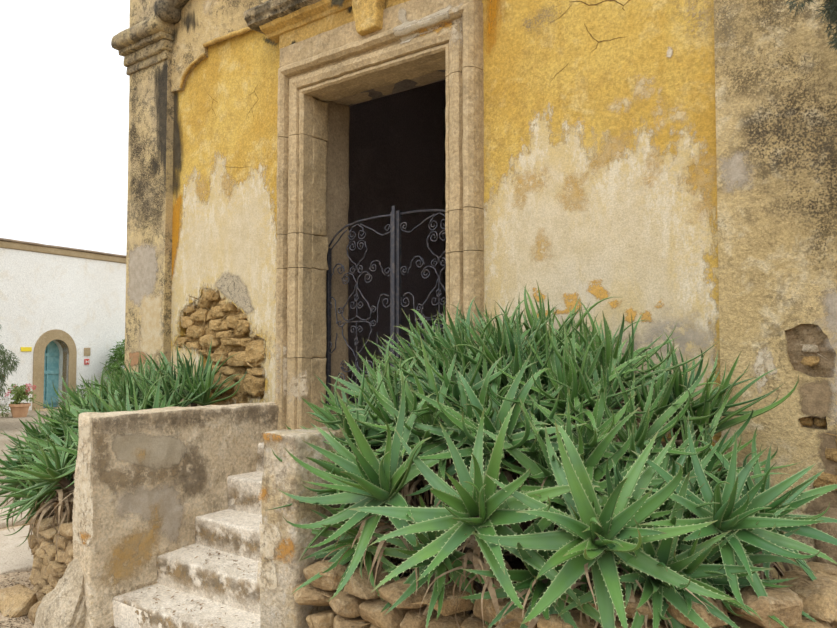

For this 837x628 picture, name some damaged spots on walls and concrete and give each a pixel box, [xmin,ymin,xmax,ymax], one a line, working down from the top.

water stain [173,13,195,43]
crack [549,0,630,50]
water stain [132,61,183,230]
water stain [732,52,837,218]
peeling [129,152,277,405]
peeling [484,77,719,412]
spalling [786,324,837,514]